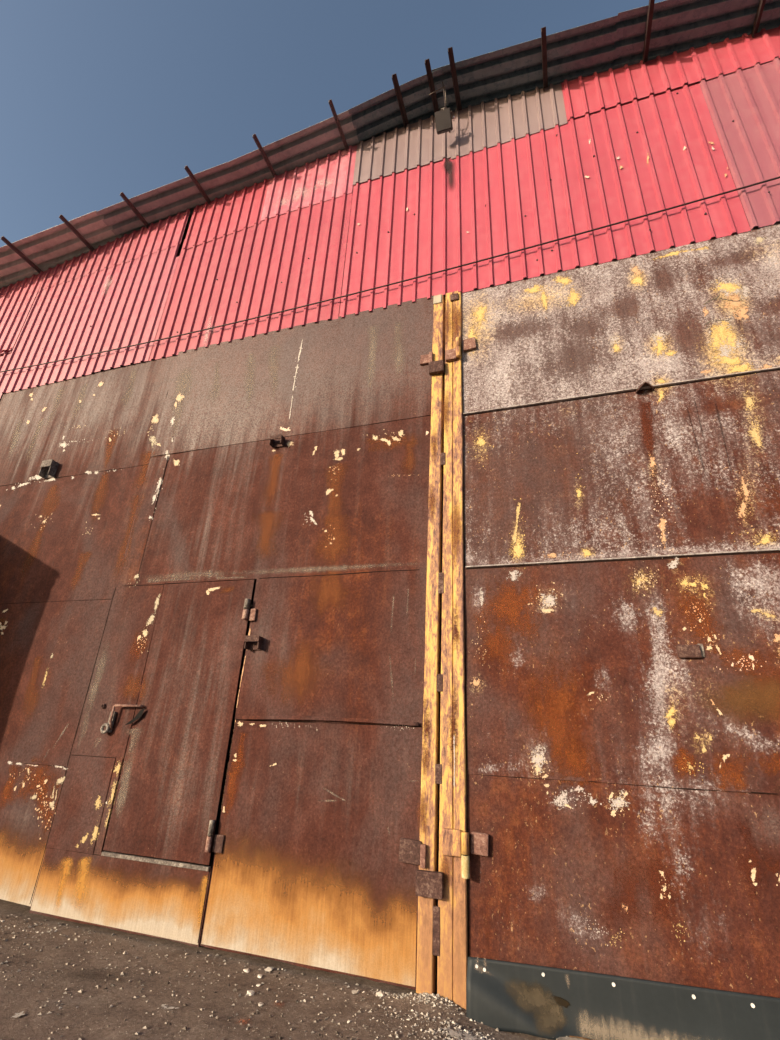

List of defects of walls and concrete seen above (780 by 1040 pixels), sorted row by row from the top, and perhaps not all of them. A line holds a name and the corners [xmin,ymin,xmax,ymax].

damp [445,147,453,186]
peeling [700,276,780,375]
peeling [148,394,184,466]
peeling [326,448,360,496]
peeling [373,429,403,445]
rust [317,464,347,609]
rust [679,591,780,713]
rust [1,760,58,828]
peeling [8,761,68,839]
peeling [529,744,631,817]
rust [0,833,417,987]
rust [607,860,675,926]